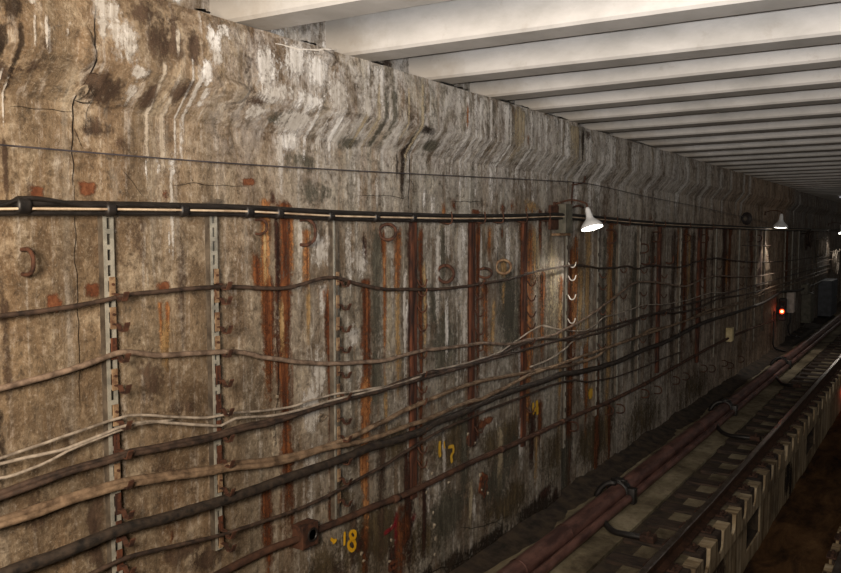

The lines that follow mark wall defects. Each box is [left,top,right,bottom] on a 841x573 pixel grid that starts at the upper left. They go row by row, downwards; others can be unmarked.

leakage [0,0,41,122]
leakage [34,15,53,53]
crack [10,6,98,399]
leakage [81,0,230,250]
corrosion [253,193,311,573]
leakage [245,29,397,190]
corrosion [352,279,372,572]
corrosion [381,228,427,573]
leakage [396,85,438,198]
corrosion [468,209,507,398]
corrosion [519,200,547,478]
corrosion [557,223,614,485]